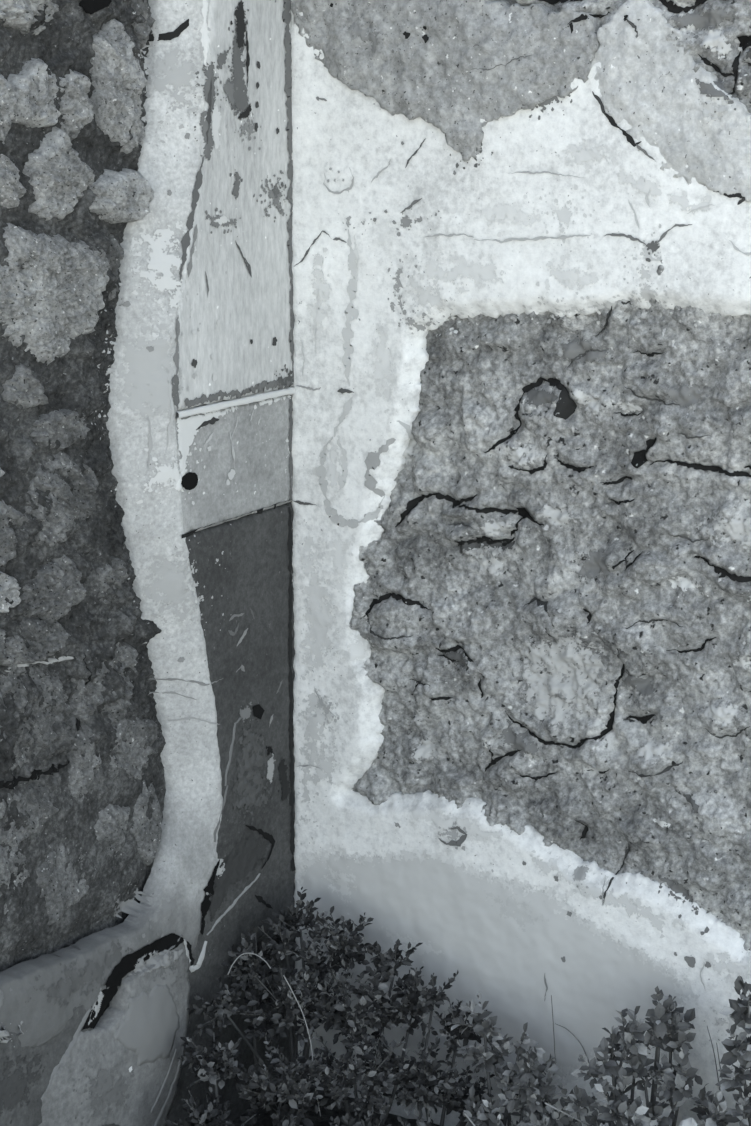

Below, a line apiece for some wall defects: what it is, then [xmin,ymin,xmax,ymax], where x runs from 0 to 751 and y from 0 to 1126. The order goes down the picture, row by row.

spalling [184,0,260,160]
crack [592,91,654,160]
spalling [671,2,751,134]
crack [426,190,745,246]
spalling [525,320,643,428]
crack [484,306,751,505]
crack [395,492,544,546]
flaking render [454,508,529,587]
crack [365,593,432,640]
flaking render [483,609,659,761]
crack [435,619,717,781]
spalling [640,859,723,918]